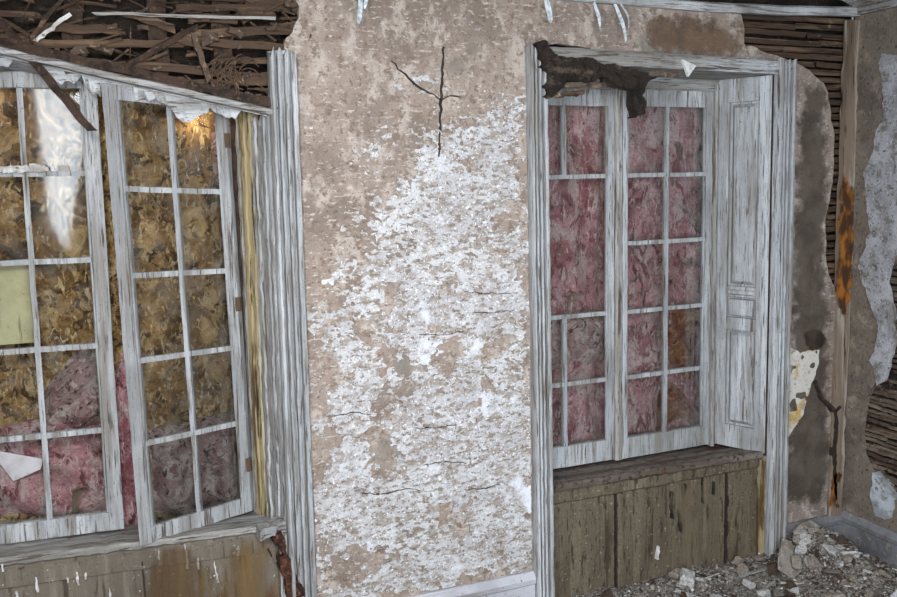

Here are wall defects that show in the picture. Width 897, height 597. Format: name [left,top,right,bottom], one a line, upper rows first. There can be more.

flaking render [0,0,298,108]
crack [391,46,461,157]
flaking render [533,40,696,119]
corrosion [835,176,854,315]
flaking render [858,53,897,520]
peeling [788,348,819,438]
corrosion [829,473,842,507]